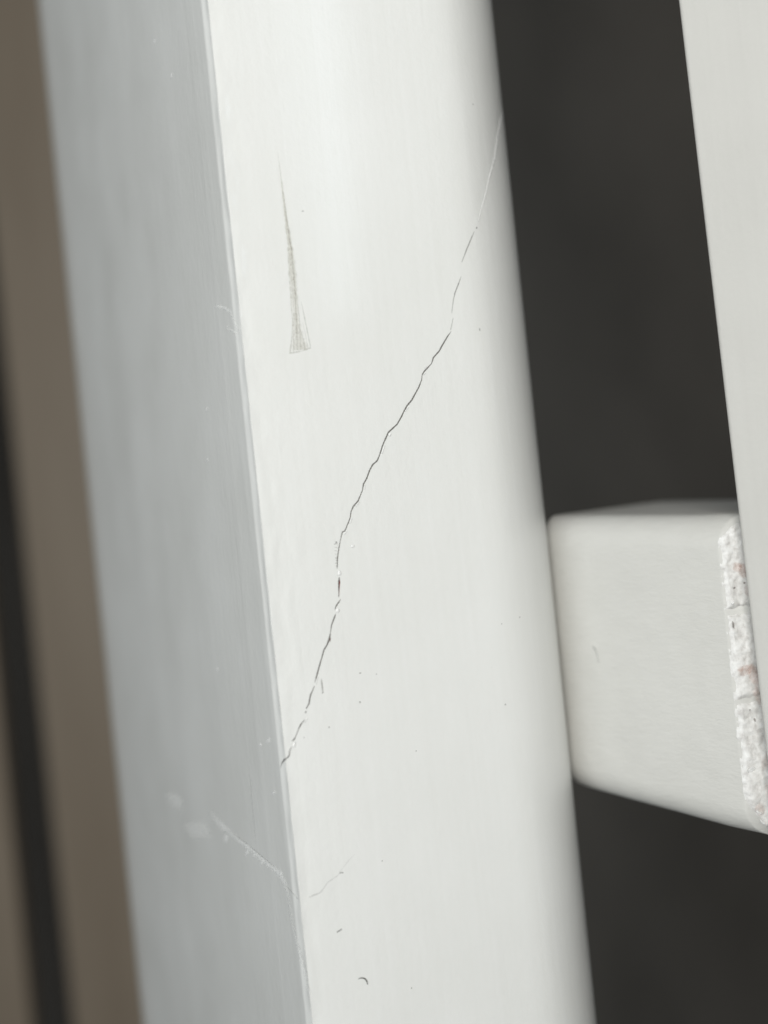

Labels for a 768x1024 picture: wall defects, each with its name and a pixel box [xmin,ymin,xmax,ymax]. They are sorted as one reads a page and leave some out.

crack [465,114,502,252]
crack [282,333,450,763]
peeling [718,523,768,827]